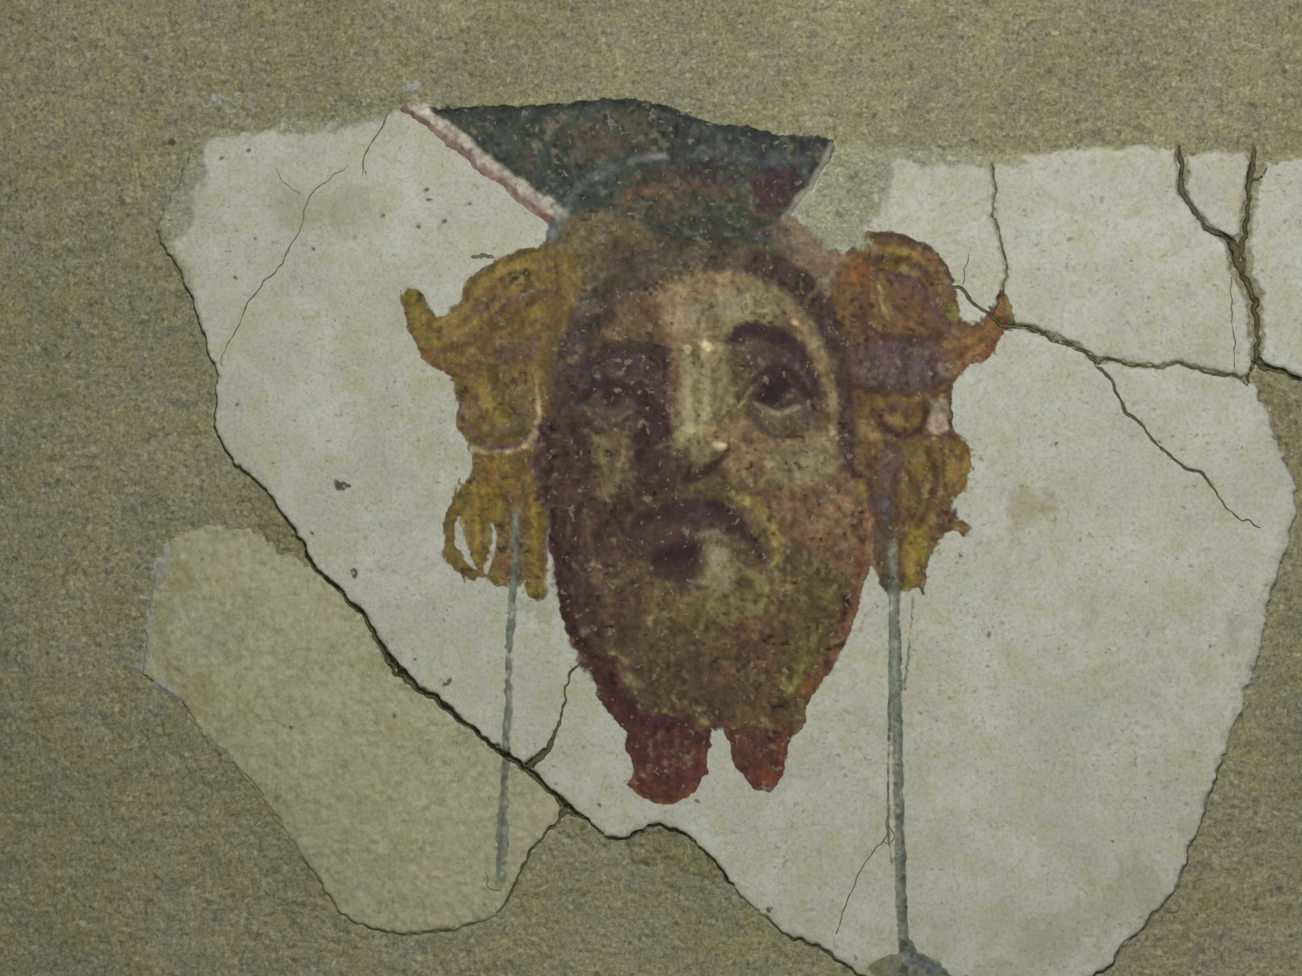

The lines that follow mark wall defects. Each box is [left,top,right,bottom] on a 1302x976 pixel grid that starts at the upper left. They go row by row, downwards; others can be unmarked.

crack [166,112,734,935]
crack [933,143,1302,528]